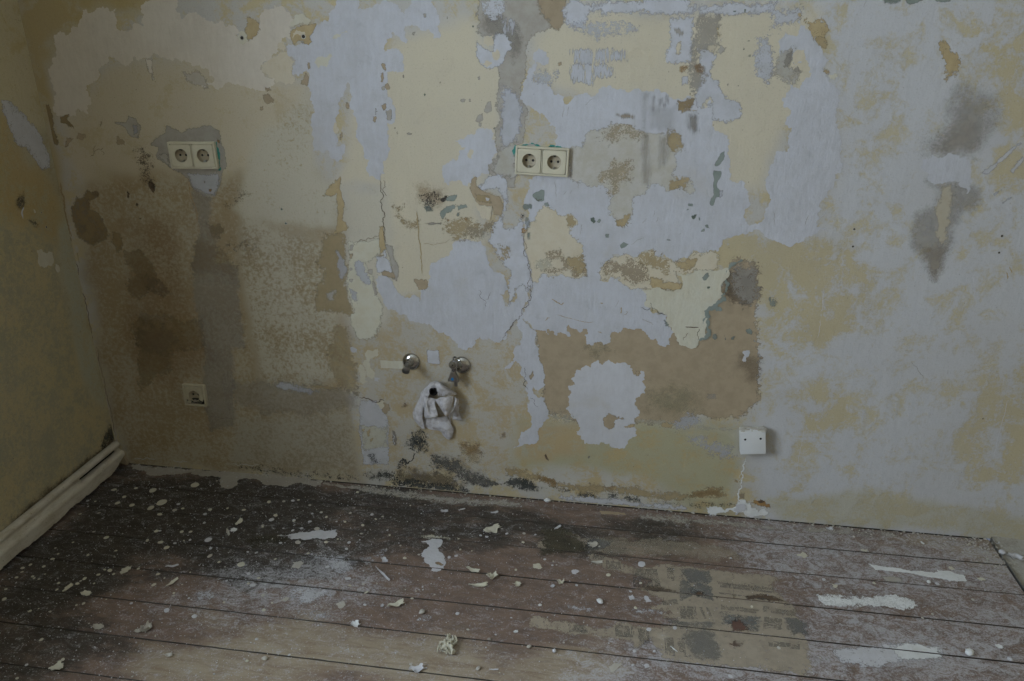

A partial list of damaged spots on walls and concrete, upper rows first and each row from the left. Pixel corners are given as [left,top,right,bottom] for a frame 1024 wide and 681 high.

peeling [237,17,259,44]
peeling [289,14,316,45]
flaking render [798,13,829,49]
flaking render [939,41,961,82]
flaking render [46,105,86,147]
flaking render [424,0,566,220]
peeling [315,177,399,384]
flaking render [523,122,776,426]
peeling [358,400,397,465]
water stain [238,430,641,503]
crack [737,458,746,500]